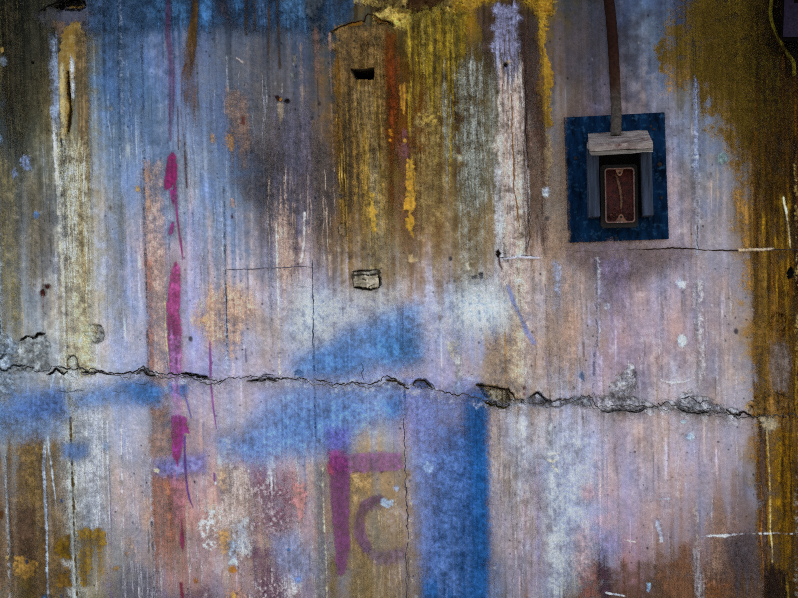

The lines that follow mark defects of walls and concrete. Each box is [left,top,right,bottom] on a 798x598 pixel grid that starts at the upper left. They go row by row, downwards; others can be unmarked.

spalling [354,0,462,30]
rust [328,22,419,312]
crack [568,224,798,253]
rust [571,0,798,598]
spalling [0,325,51,407]
spalling [328,377,461,402]
crack [0,332,798,420]
spalling [474,363,795,425]